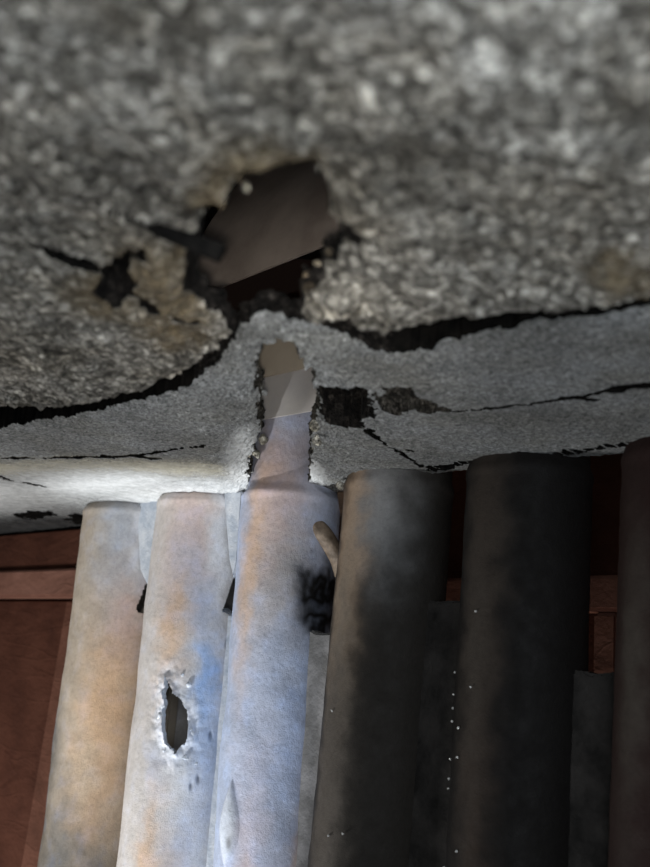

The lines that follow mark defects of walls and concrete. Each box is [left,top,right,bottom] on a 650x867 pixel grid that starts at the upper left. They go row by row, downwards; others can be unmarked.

hole [92,248,139,309]
crack [394,296,650,353]
crack [0,364,195,429]
spalling [316,385,452,429]
crack [449,382,650,412]
crack [0,444,206,486]
crack [363,428,470,472]
crack [552,442,629,456]